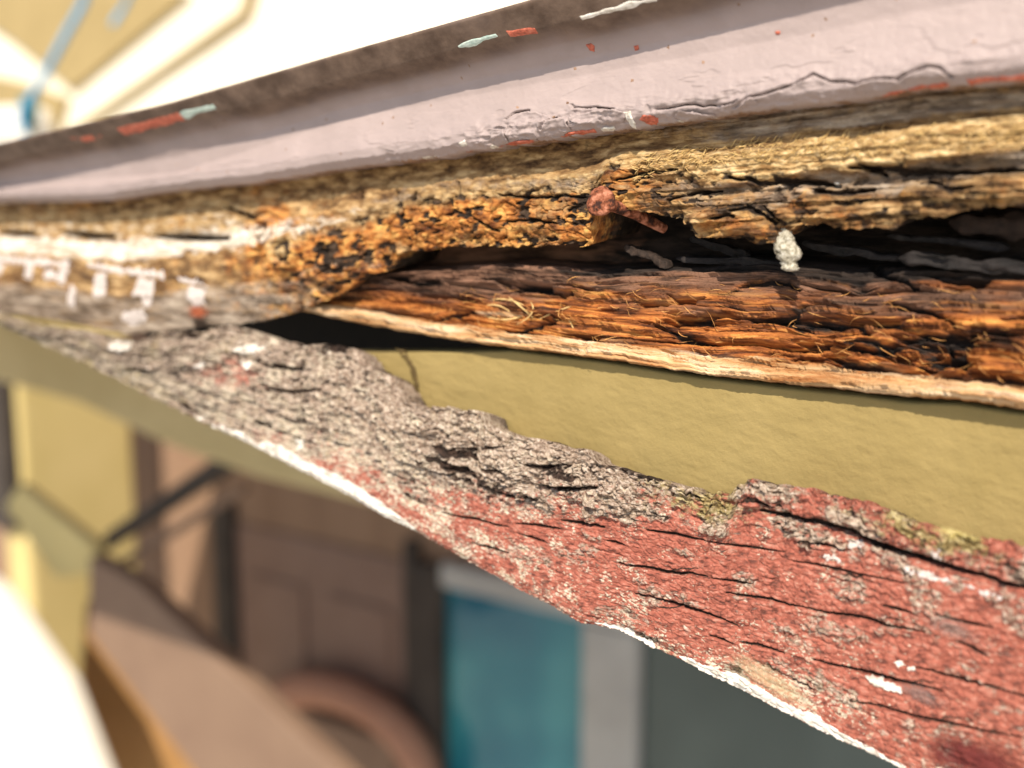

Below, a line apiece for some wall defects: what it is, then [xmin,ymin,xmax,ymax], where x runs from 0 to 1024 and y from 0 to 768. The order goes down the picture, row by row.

crack [667,66,952,109]
peeling [108,340,137,354]
peeling [233,342,266,370]
peeling [195,416,417,531]
crack [545,483,597,491]
crack [646,529,785,552]
crack [767,510,1024,588]
crack [629,564,703,575]
crack [637,593,778,650]
crack [728,592,924,632]
crack [822,660,1024,696]
crack [868,702,1013,735]